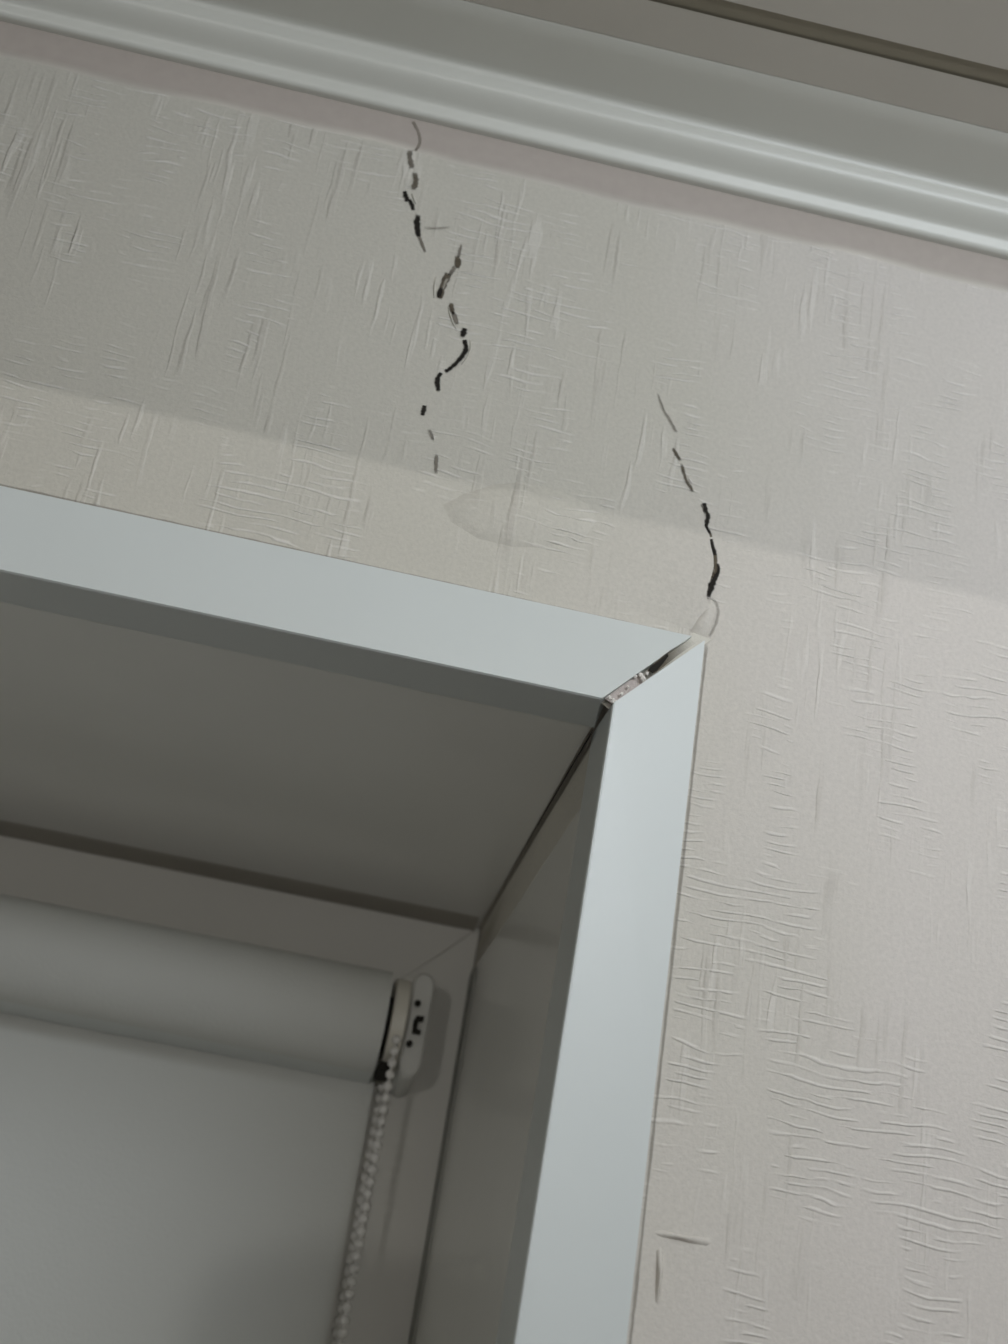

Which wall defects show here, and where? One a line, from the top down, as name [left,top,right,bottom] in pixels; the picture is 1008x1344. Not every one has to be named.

crack [403,122,472,472]
crack [659,398,720,597]